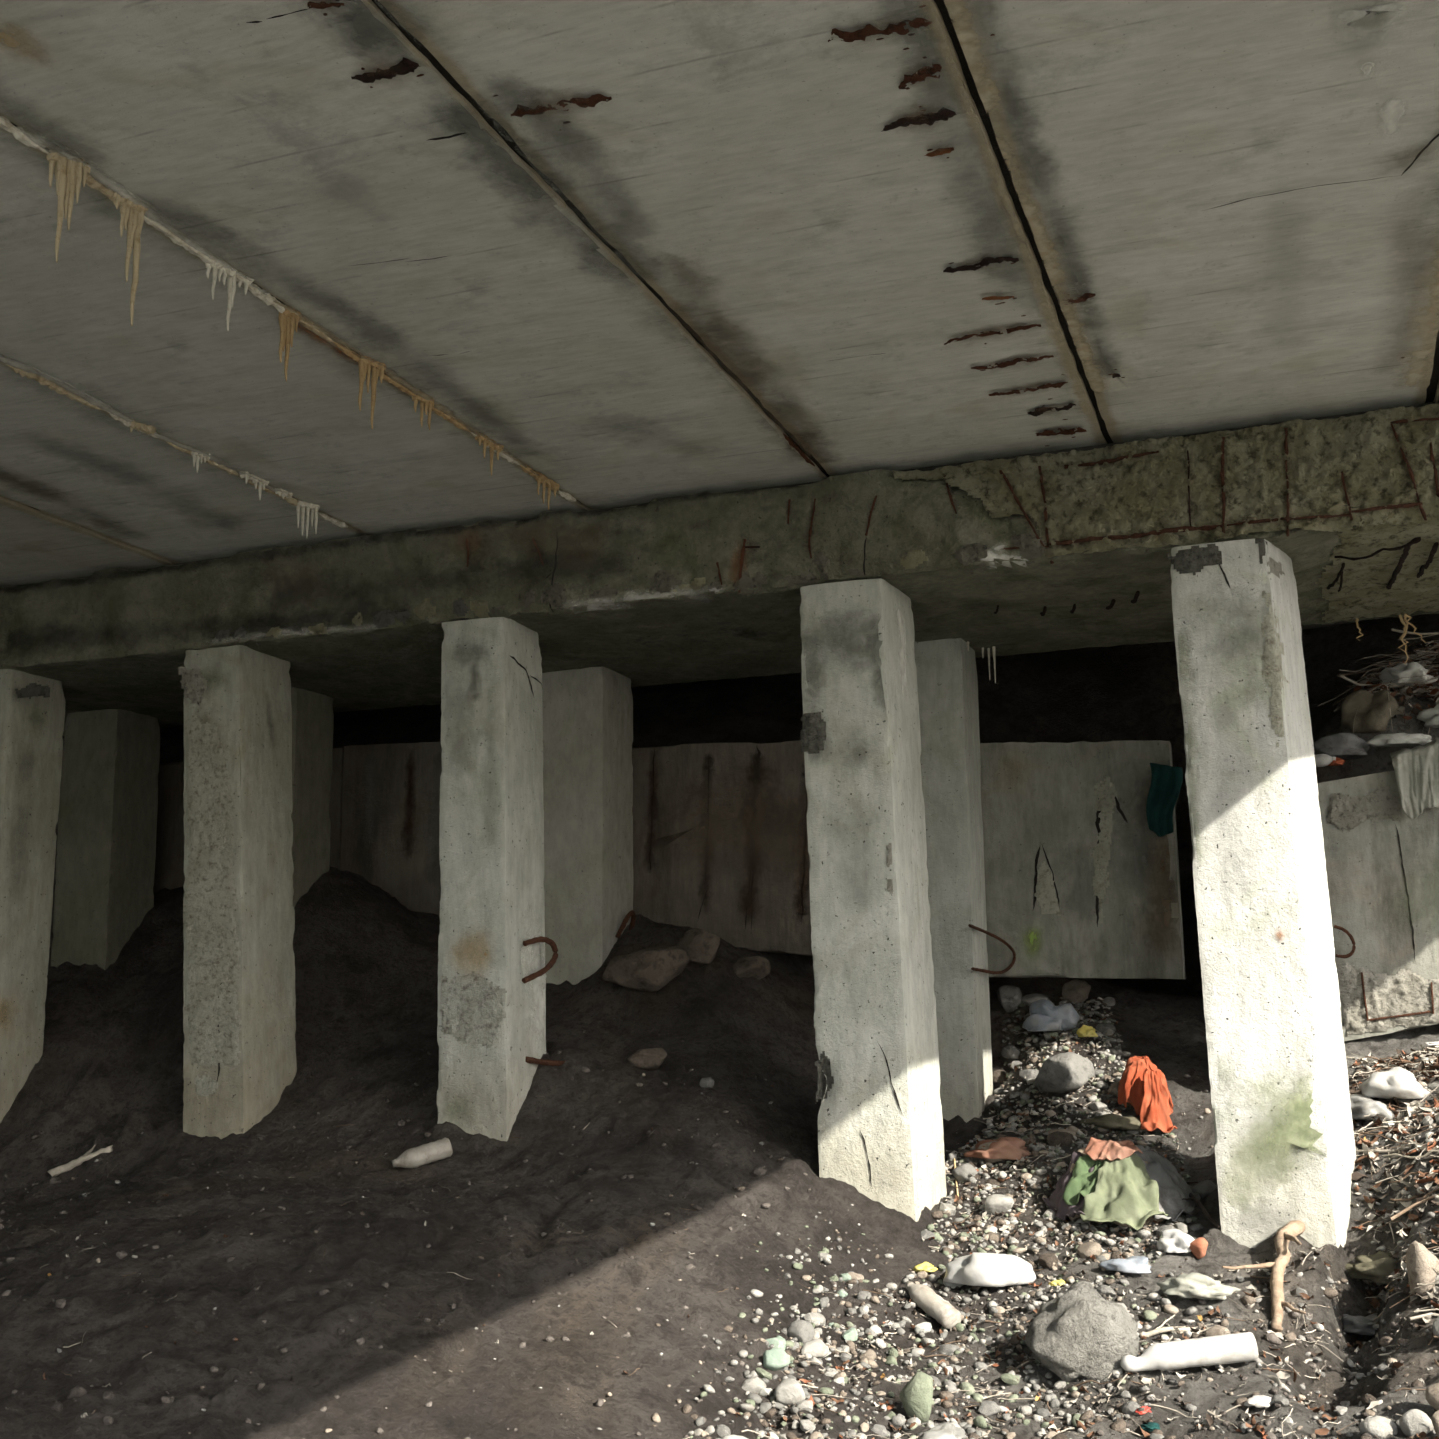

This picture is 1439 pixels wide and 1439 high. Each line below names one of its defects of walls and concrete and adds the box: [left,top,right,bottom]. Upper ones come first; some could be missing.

leakage [340,0,409,55]
corrosion [351,57,424,88]
corrosion [828,5,942,90]
corrosion [511,94,612,131]
corrosion [883,106,957,131]
leakage [0,106,619,548]
corrosion [989,374,1087,446]
leakage [0,561,209,593]
spalling [893,403,1439,747]
crack [1033,845,1061,916]
crack [1091,777,1128,927]
spalling [1337,963,1439,1036]